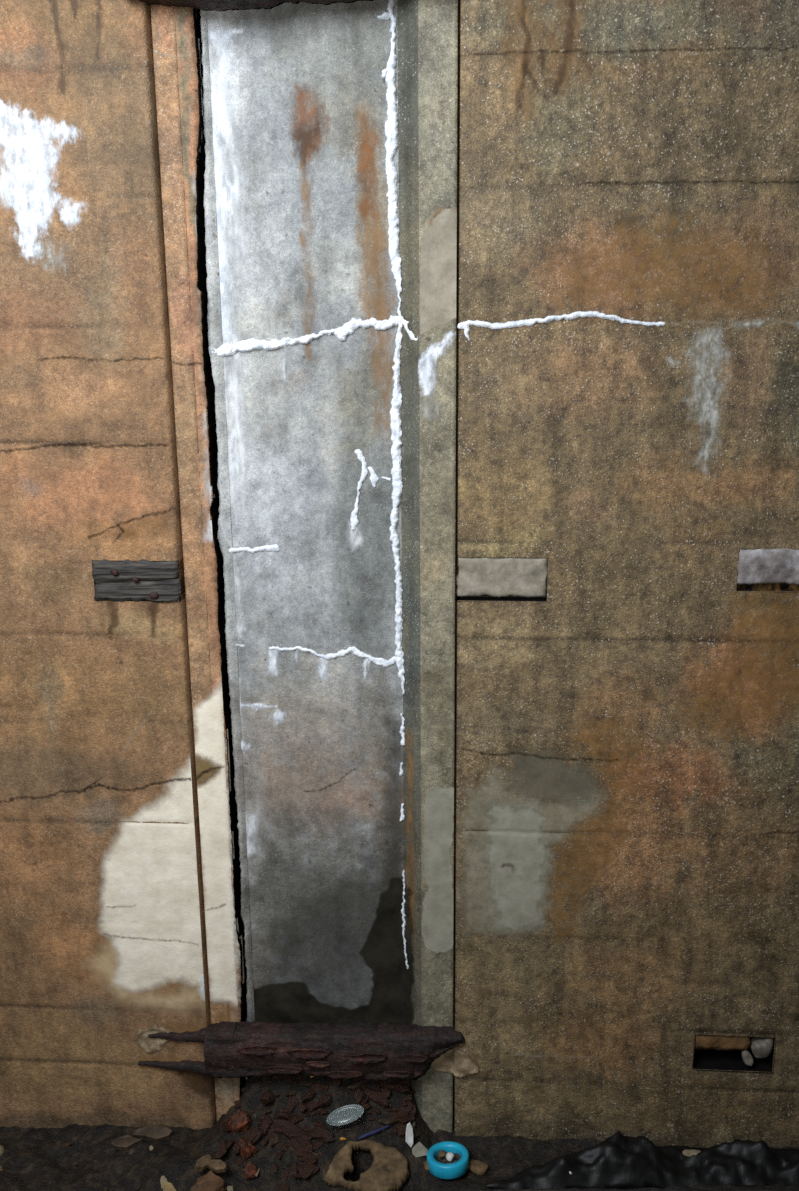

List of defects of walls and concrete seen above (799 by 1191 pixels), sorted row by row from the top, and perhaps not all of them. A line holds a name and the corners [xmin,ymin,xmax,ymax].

leakage [0,100,80,268]
rust [293,91,321,167]
rust [359,199,387,321]
leakage [350,0,405,694]
crack [458,311,665,340]
leakage [689,330,727,472]
crack [2,6,418,1022]
peeling [95,686,244,1007]
peeling [486,805,546,930]
leakage [253,871,414,1024]
crack [232,1077,248,1106]